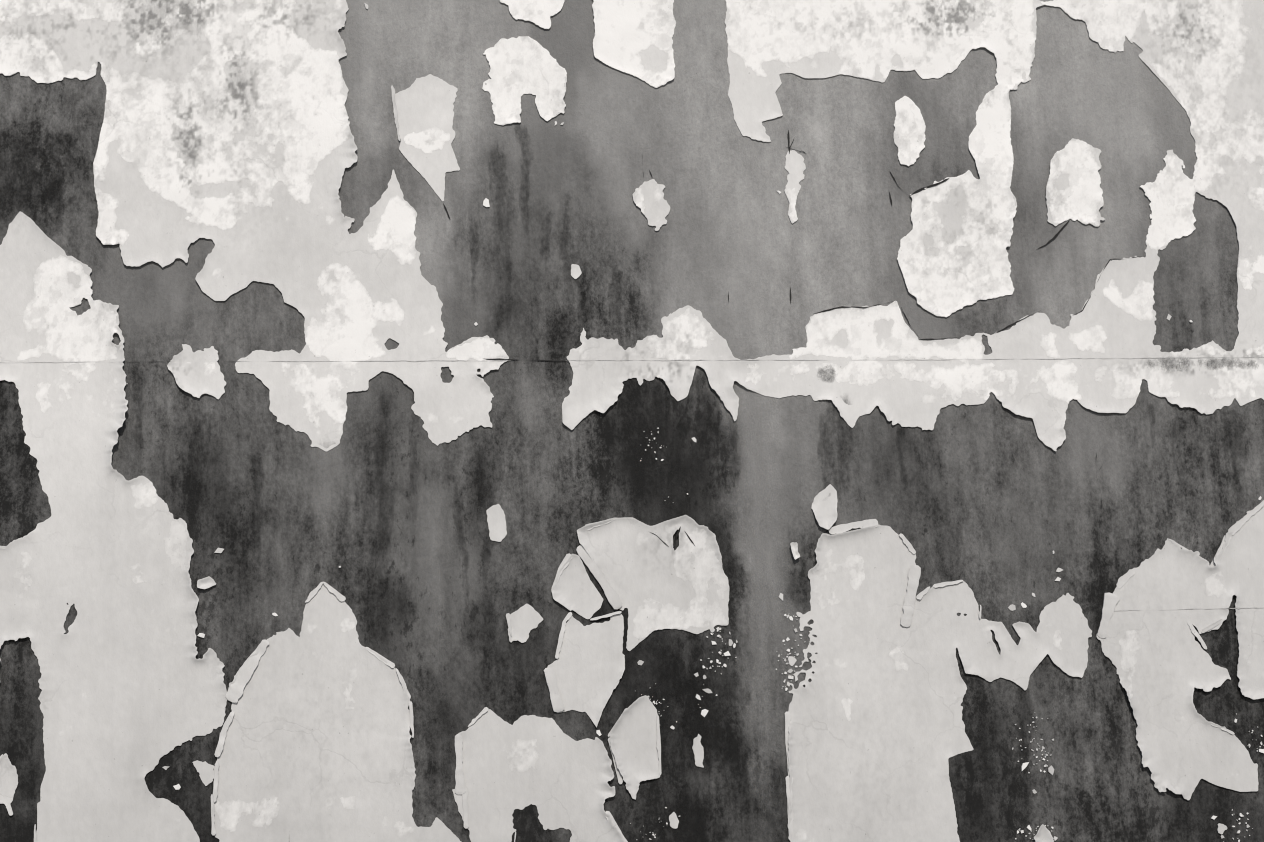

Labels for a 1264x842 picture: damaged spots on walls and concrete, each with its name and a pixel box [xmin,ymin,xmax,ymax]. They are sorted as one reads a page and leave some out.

peeling [482,0,567,126]
peeling [0,0,509,452]
peeling [562,0,1264,451]
crack [0,358,78,366]
crack [227,357,317,365]
crack [401,356,729,364]
crack [1048,354,1264,362]
peeling [0,211,729,842]
peeling [785,484,1264,842]